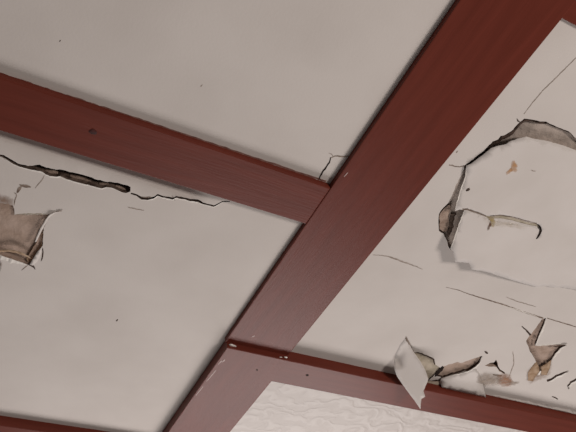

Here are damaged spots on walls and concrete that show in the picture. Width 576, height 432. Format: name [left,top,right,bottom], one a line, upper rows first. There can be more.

crack [524,58,576,114]
peeling [0,185,60,270]
crack [0,155,230,211]
crack [319,153,349,179]
peeling [438,119,576,290]
crack [446,287,576,327]
peeling [394,337,440,408]
spalling [488,394,576,414]